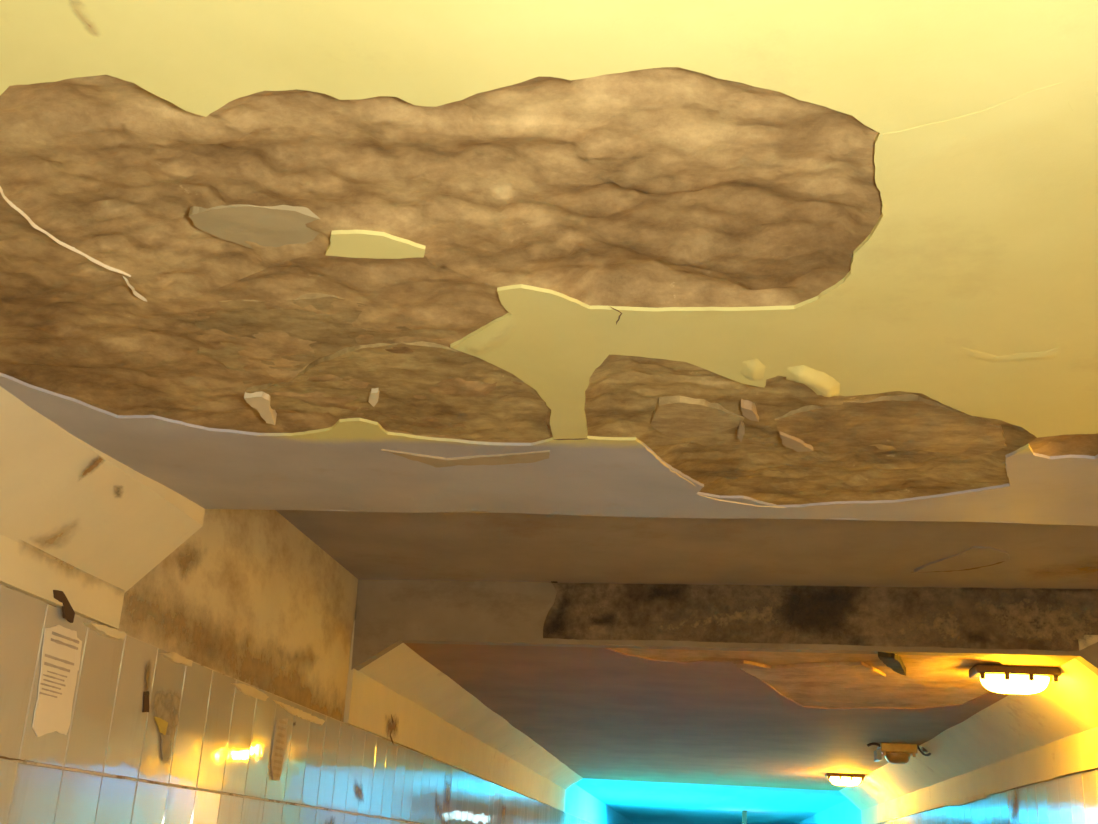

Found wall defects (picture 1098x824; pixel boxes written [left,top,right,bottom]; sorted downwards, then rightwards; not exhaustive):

spalling [0,67,882,468]
spalling [584,355,1098,508]
spalling [543,581,1098,708]